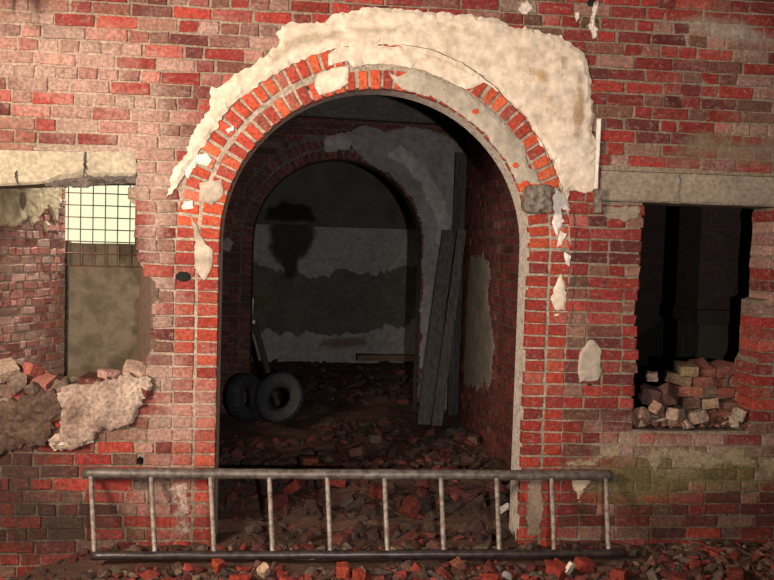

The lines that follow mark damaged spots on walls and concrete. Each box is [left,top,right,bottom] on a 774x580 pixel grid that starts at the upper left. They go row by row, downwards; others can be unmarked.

flaking render [166,7,596,280]
flaking render [0,174,137,233]
leakage [266,202,315,221]
leakage [252,258,417,337]
flaking render [323,125,463,412]
flaking render [464,252,495,392]
flaking render [551,274,566,316]
flaking render [577,340,602,382]
spalling [0,372,153,455]